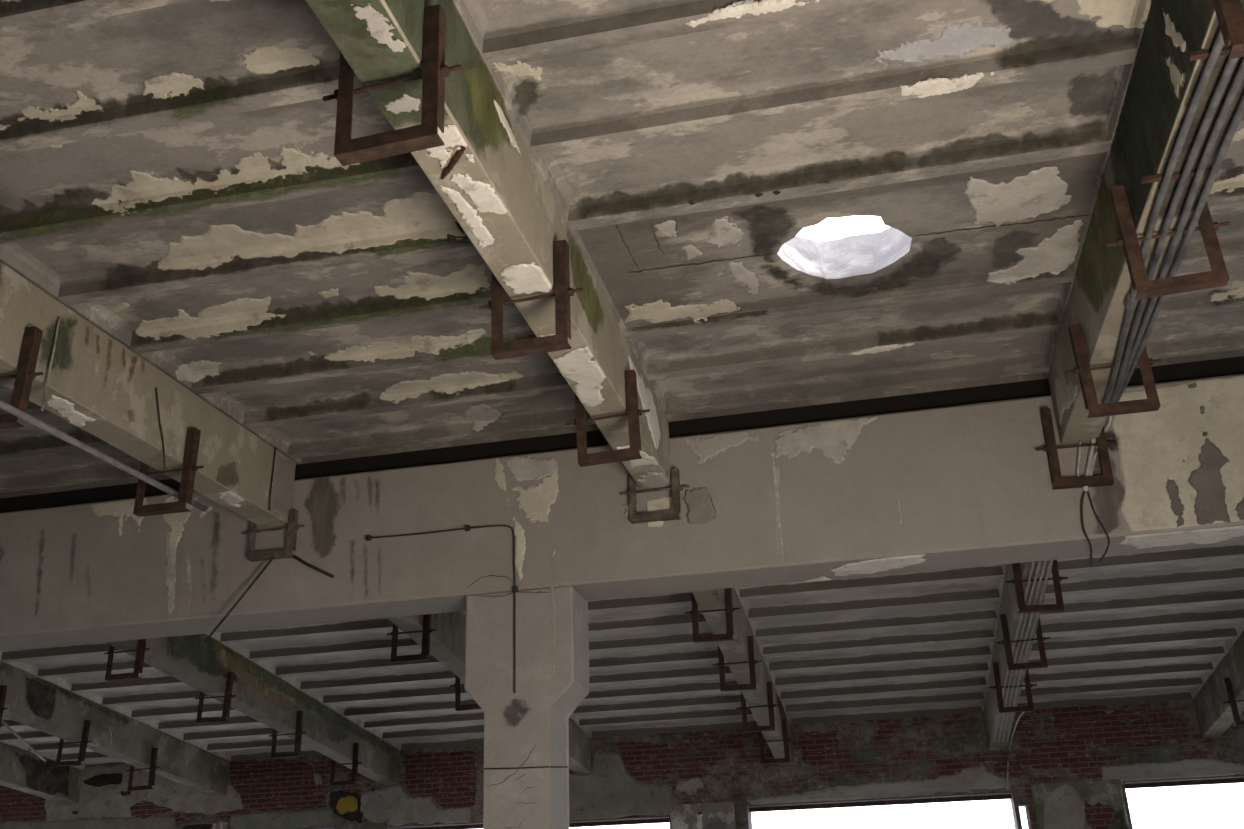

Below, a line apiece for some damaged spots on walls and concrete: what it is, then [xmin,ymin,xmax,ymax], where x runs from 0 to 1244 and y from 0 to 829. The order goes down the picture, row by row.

damp [986,0,1113,67]
peeling [90,146,361,216]
peeling [157,125,507,270]
damp [580,71,1117,297]
peeling [965,166,1072,227]
peeling [135,296,287,340]
peeling [319,288,339,298]
damp [305,477,344,557]
peeling [494,455,559,580]
flaking render [230,760,363,823]
flaking render [404,750,476,808]